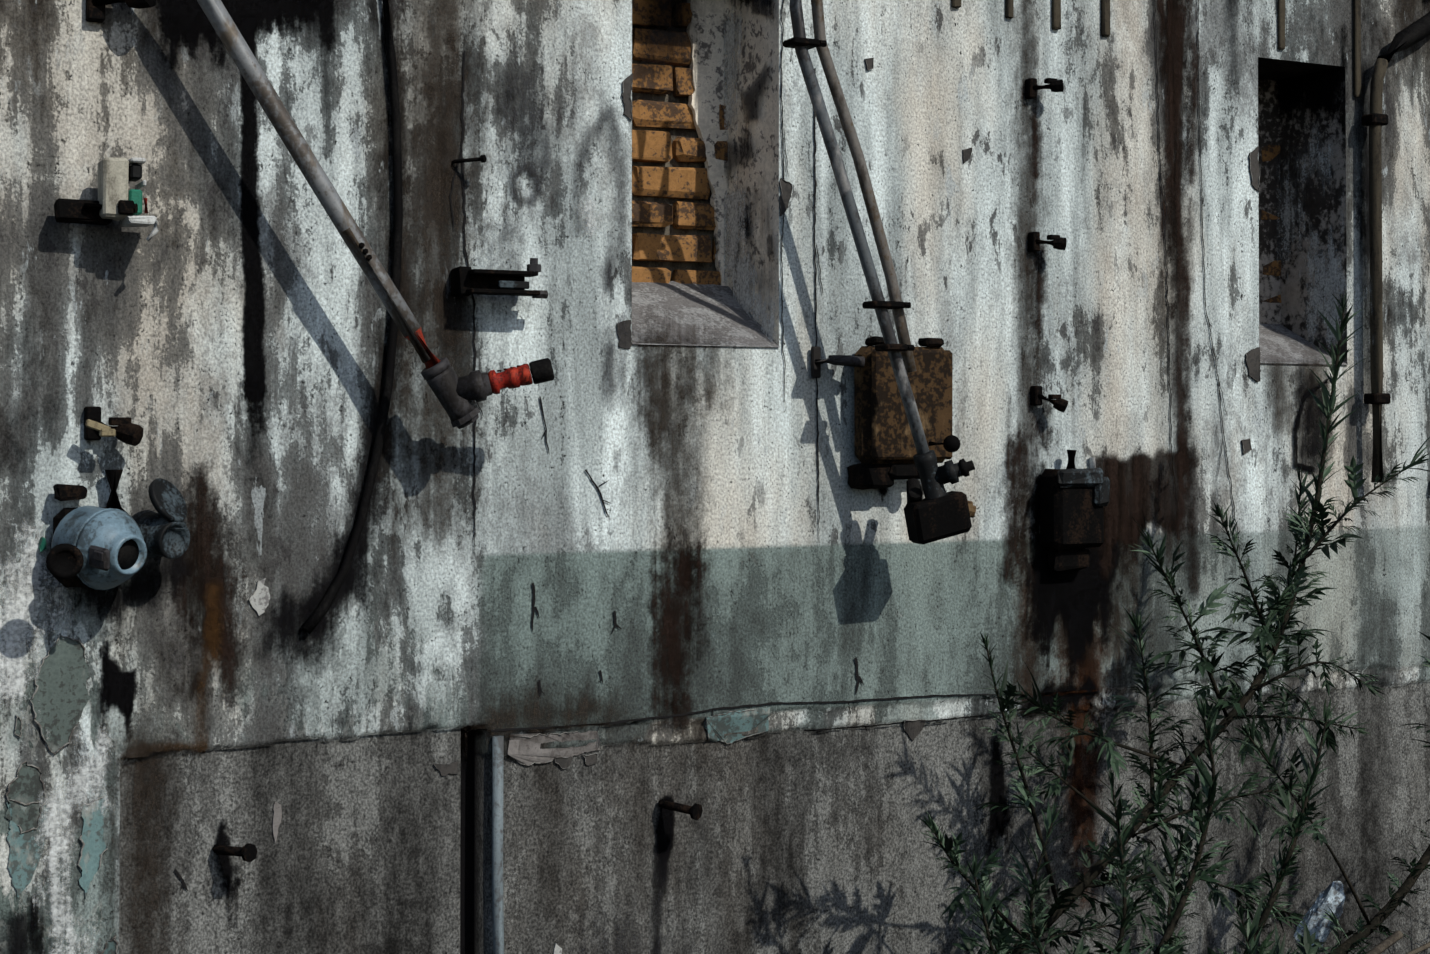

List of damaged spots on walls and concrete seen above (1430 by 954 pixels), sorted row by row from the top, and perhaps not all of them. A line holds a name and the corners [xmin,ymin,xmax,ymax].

leakage [277,0,335,51]
spalling [621,73,633,120]
spalling [686,0,792,342]
leakage [1002,0,1049,581]
leakage [1156,0,1206,595]
peeling [0,530,137,954]
spalling [507,730,601,766]
peeling [704,707,770,744]
spalling [902,719,926,741]
corrosion [1022,448,1186,872]